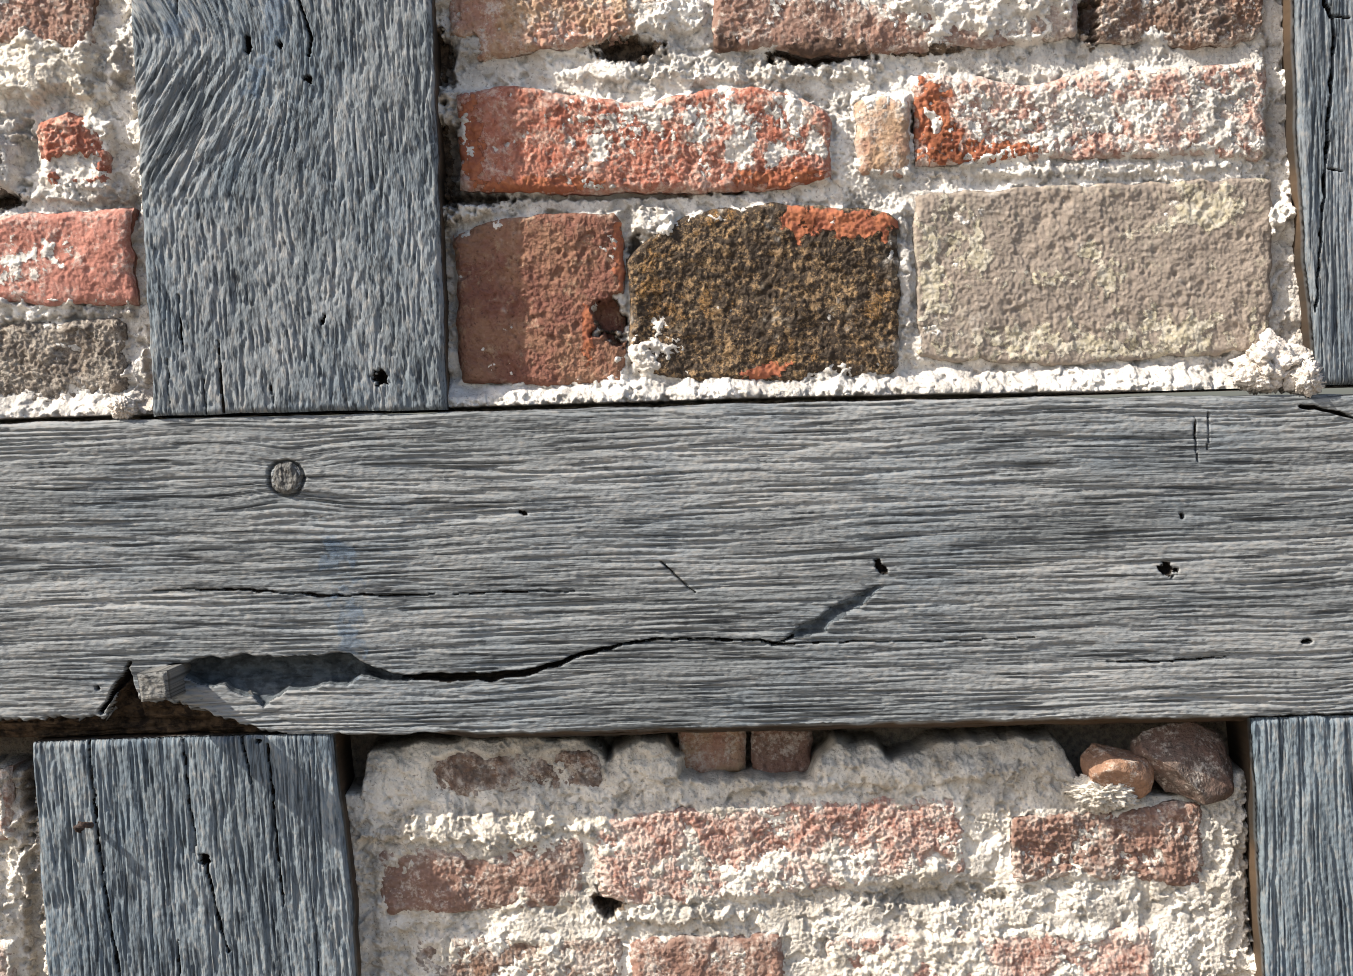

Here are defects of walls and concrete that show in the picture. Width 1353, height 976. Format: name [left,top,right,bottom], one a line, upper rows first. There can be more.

crack [1314,0,1350,312]
crack [1298,405,1353,419]
crack [200,588,421,597]
crack [469,588,528,596]
crack [411,637,857,683]
crack [88,663,133,976]
crack [183,751,196,831]
crack [241,736,284,903]
crack [206,862,231,953]